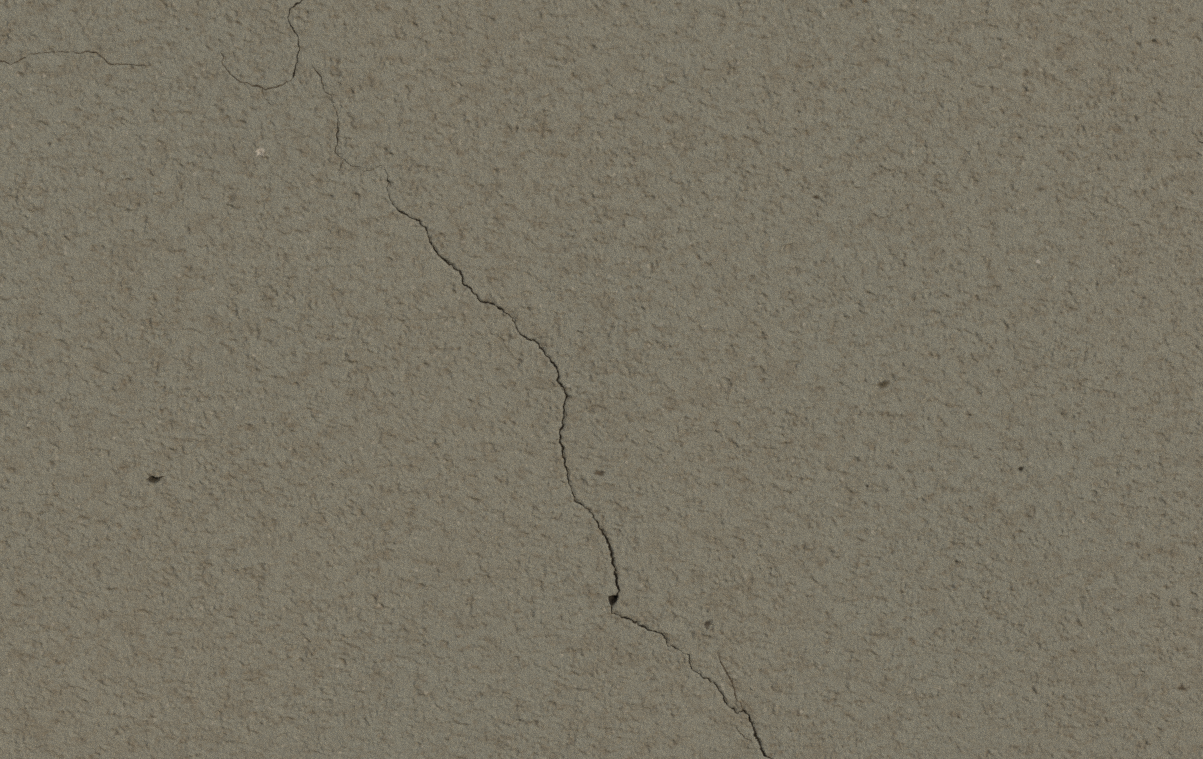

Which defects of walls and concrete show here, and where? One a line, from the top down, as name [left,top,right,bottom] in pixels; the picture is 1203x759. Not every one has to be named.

crack [221,0,772,759]